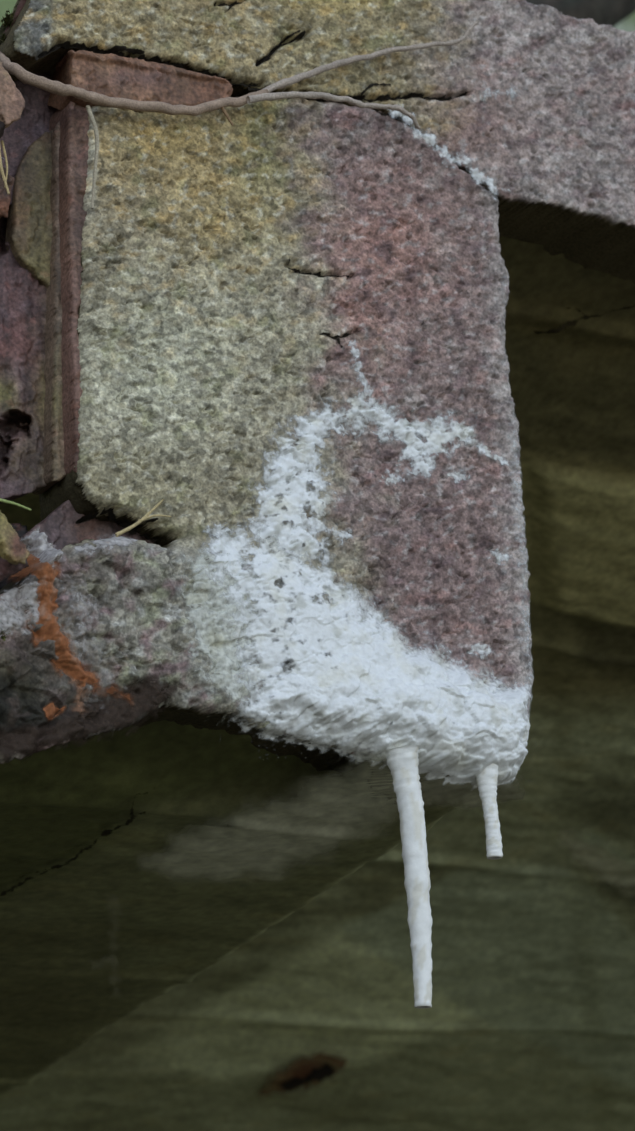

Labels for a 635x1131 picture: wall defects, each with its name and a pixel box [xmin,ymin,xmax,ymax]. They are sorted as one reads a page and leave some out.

crack [38,30,306,92]
crack [284,258,351,278]
crack [319,331,359,348]
corrosion [9,548,134,720]
leakage [143,341,532,879]
crack [0,792,148,896]
spalling [259,1053,347,1095]